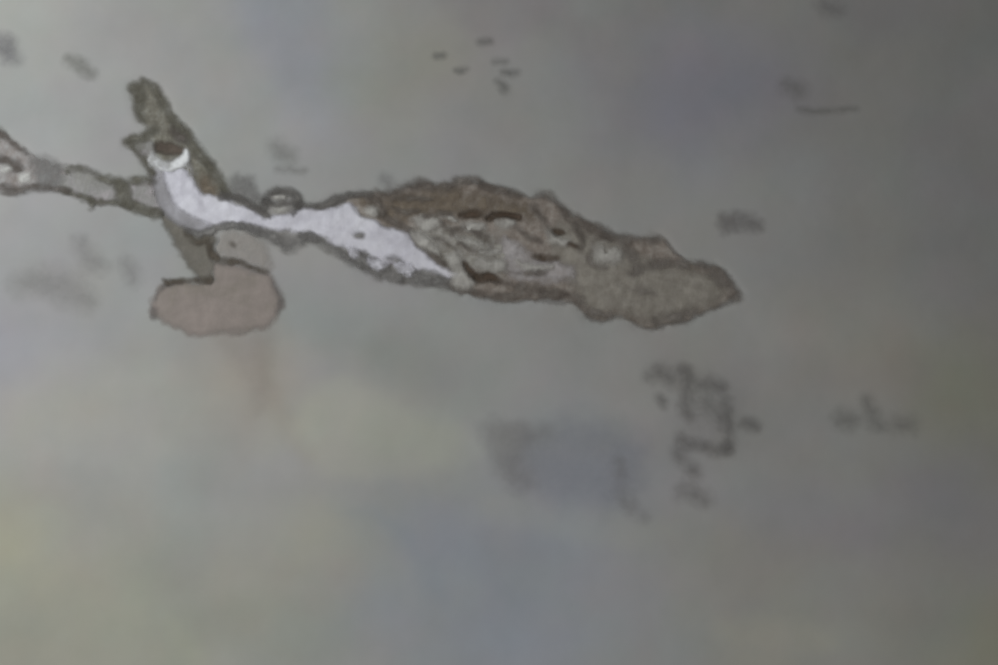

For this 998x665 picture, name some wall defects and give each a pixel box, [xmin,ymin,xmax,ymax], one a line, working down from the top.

spalling [0,130,69,195]
spalling [124,79,739,328]